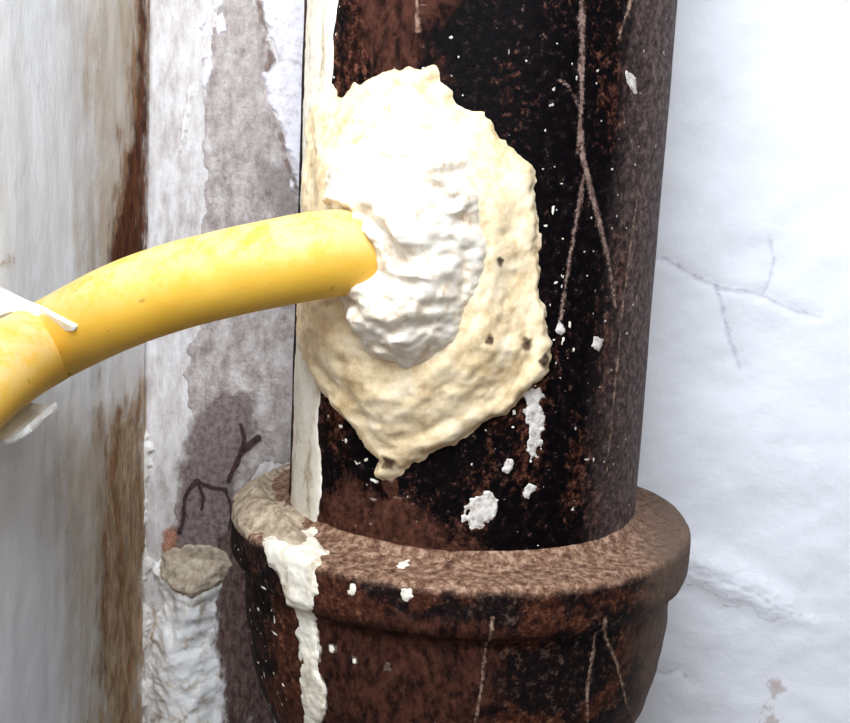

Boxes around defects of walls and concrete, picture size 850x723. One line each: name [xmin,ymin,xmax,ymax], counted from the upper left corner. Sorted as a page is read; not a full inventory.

rust [360,0,456,73]
water stain [91,0,140,266]
peeling [179,0,304,234]
peeling [183,304,295,500]
water stain [68,430,121,723]
peeling [142,538,155,653]
peeling [143,429,156,526]
spalling [161,497,183,552]
rust [317,472,487,552]
peeling [141,664,149,723]
rust [317,607,509,723]